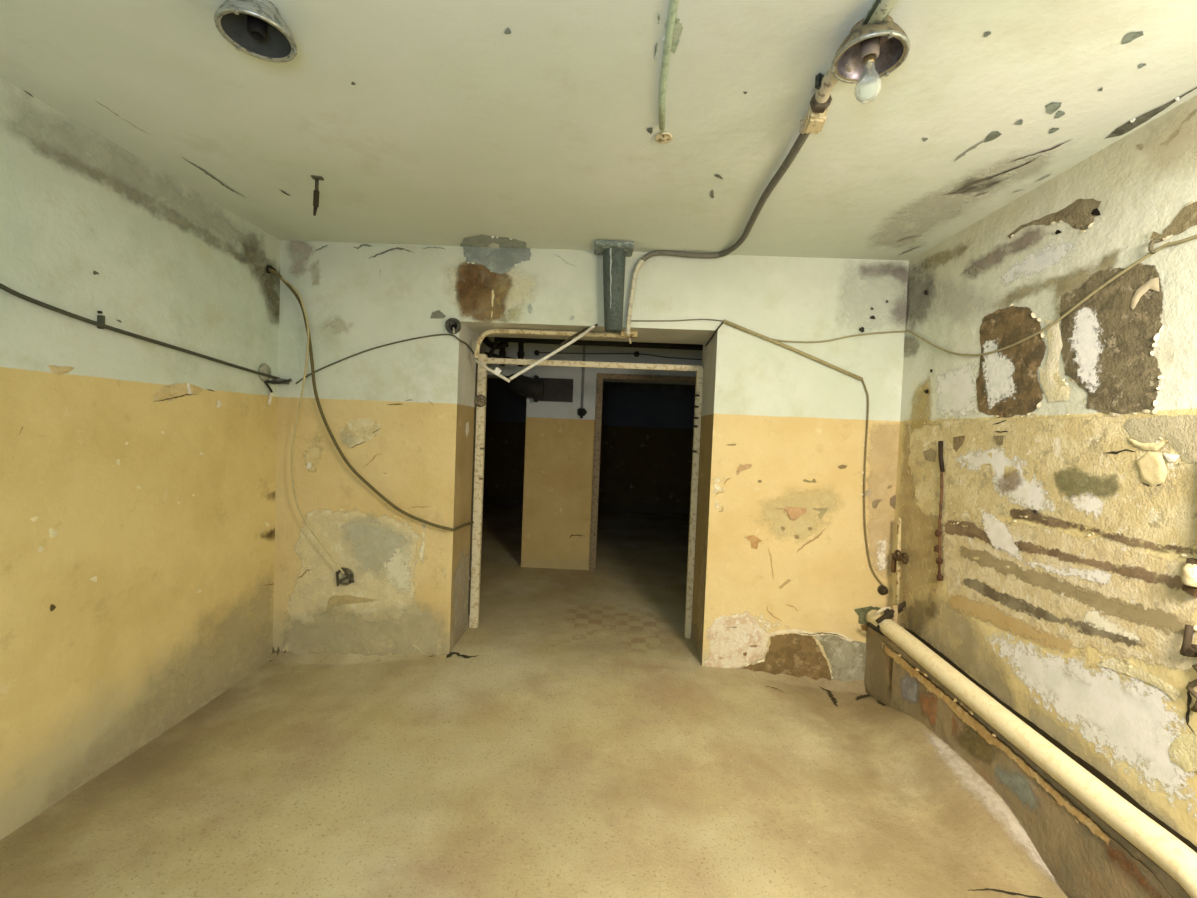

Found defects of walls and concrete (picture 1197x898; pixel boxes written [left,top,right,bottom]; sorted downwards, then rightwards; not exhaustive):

leakage [16,119,257,262]
leakage [879,161,1039,244]
spalling [1007,198,1101,239]
spalling [1150,200,1197,241]
spalling [460,234,532,274]
peeling [861,263,1197,702]
peeling [781,507,830,539]
peeling [283,507,444,656]
spalling [854,606,880,625]
spalling [742,632,866,682]
peeling [882,643,1111,846]
peeling [1168,732,1197,773]